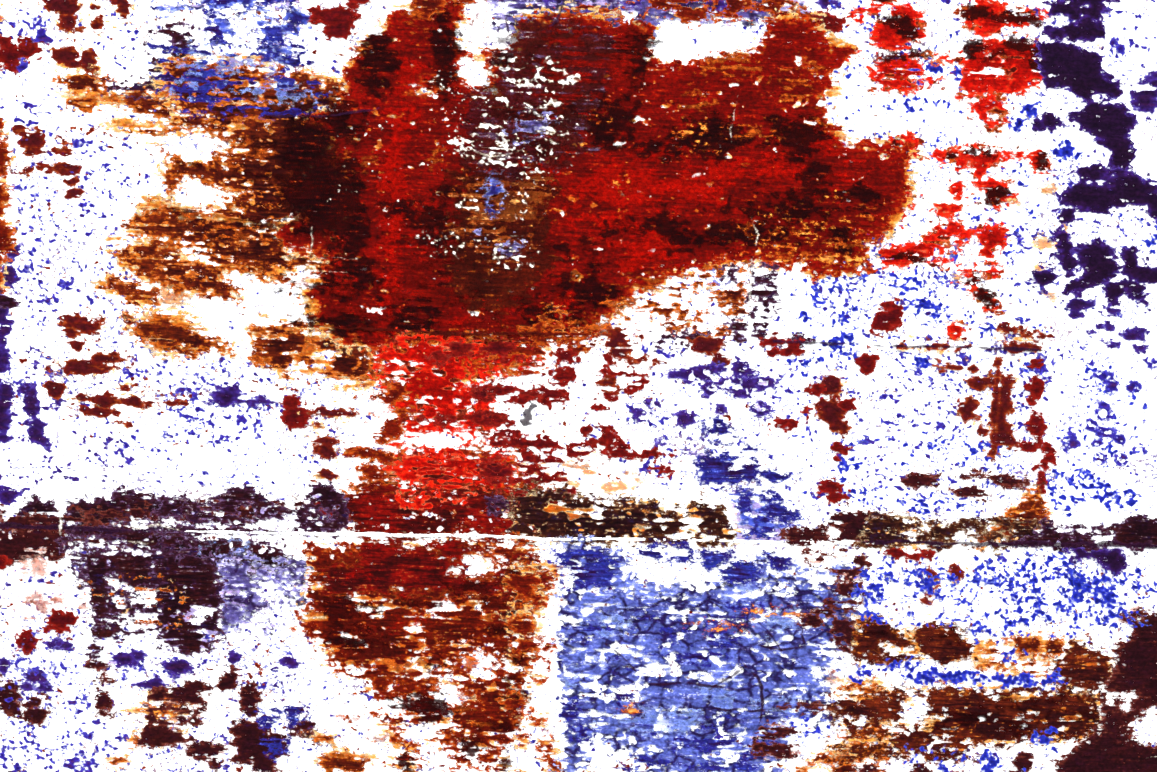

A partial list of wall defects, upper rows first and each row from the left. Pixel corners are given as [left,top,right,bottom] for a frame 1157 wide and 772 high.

corrosion [777,332,816,352]
corrosion [851,345,880,378]
corrosion [812,369,853,439]
corrosion [235,640,288,702]
crack [606,619,810,723]